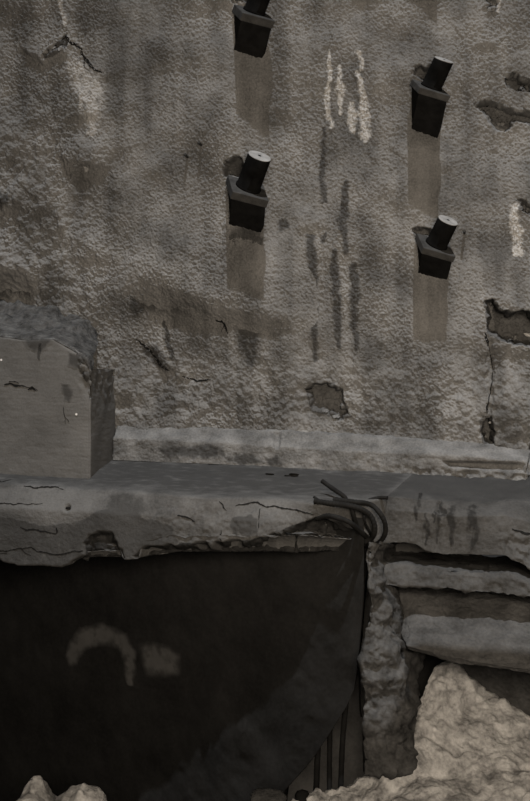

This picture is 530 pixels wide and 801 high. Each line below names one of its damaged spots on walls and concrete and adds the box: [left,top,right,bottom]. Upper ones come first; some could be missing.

spalling [504,72,530,92]
spalling [474,101,530,131]
damp [304,48,373,363]
damp [507,201,530,265]
spalling [484,299,530,346]
crack [484,333,493,412]
crack [0,479,61,505]
crack [219,501,313,528]
spalling [0,518,374,801]